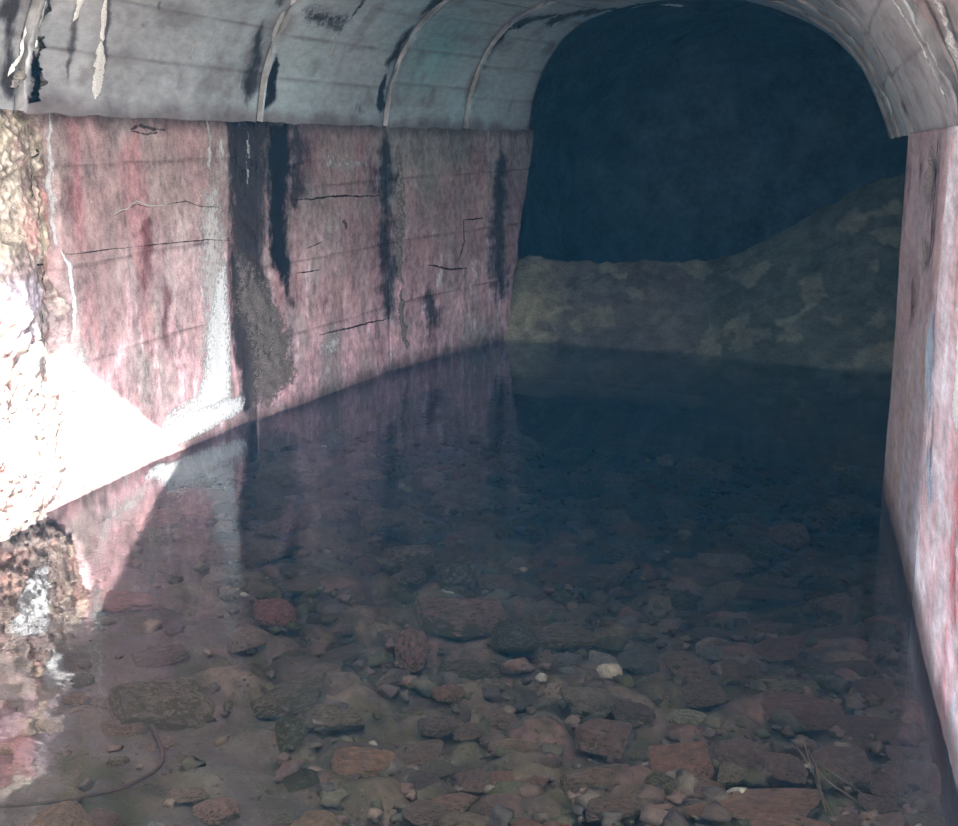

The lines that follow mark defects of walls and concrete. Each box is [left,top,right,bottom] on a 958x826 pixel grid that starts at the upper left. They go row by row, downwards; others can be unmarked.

water stain [0,0,48,98]
spalling [10,35,48,103]
water stain [66,0,84,69]
water stain [92,0,110,99]
water stain [242,0,365,109]
water stain [376,26,413,112]
water stain [892,0,947,102]
water stain [377,131,399,320]
water stain [488,148,510,301]
water stain [144,120,308,458]
water stain [419,289,440,327]